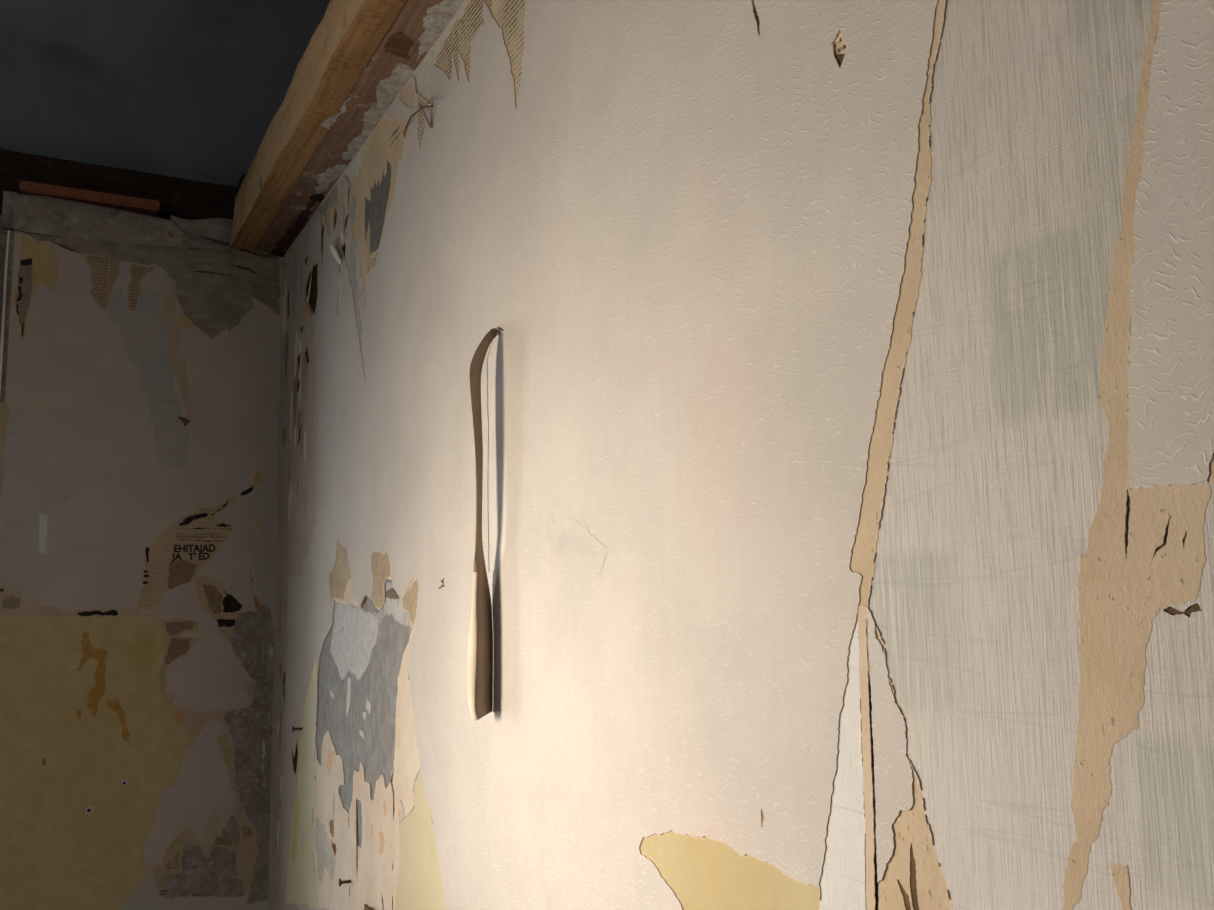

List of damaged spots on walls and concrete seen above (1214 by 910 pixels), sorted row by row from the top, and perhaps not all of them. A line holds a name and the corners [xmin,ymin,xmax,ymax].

peeling [399,28,451,145]
peeling [1,191,281,343]
peeling [320,144,369,379]
peeling [850,0,951,910]
peeling [1063,0,1214,910]
peeling [0,586,142,619]
peeling [160,604,274,903]
flaking render [317,579,412,846]